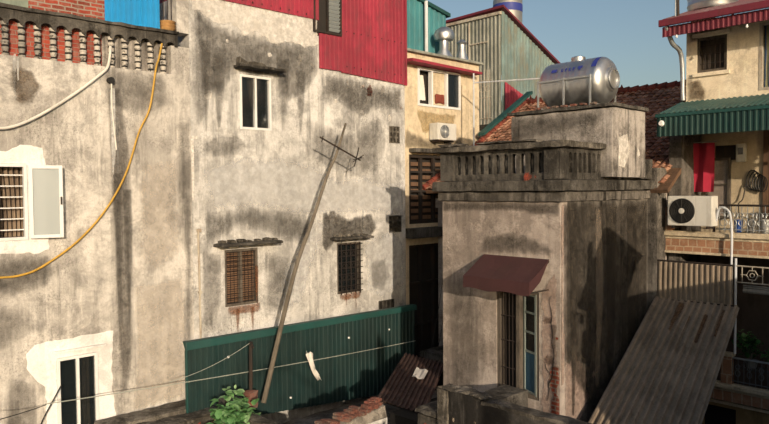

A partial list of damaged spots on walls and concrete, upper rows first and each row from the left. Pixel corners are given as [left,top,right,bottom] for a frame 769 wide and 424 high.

leakage [205,26,314,96]
leakage [326,80,399,110]
leakage [114,93,130,371]
crack [543,300,554,400]
peeling [541,205,588,420]